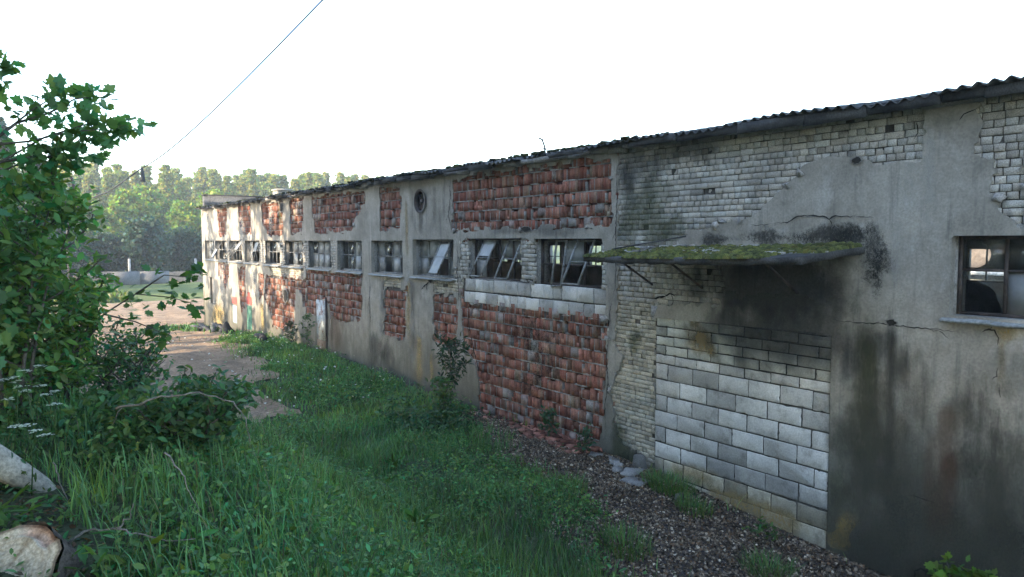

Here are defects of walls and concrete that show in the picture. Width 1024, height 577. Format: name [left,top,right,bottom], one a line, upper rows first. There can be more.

flaking render [974,93,1024,236]
flaking render [217,191,365,333]
flaking render [380,187,402,231]
flaking render [384,277,408,341]
flaking render [428,109,926,467]
leakage [702,222,892,295]
crack [751,215,874,229]
crack [842,321,953,339]